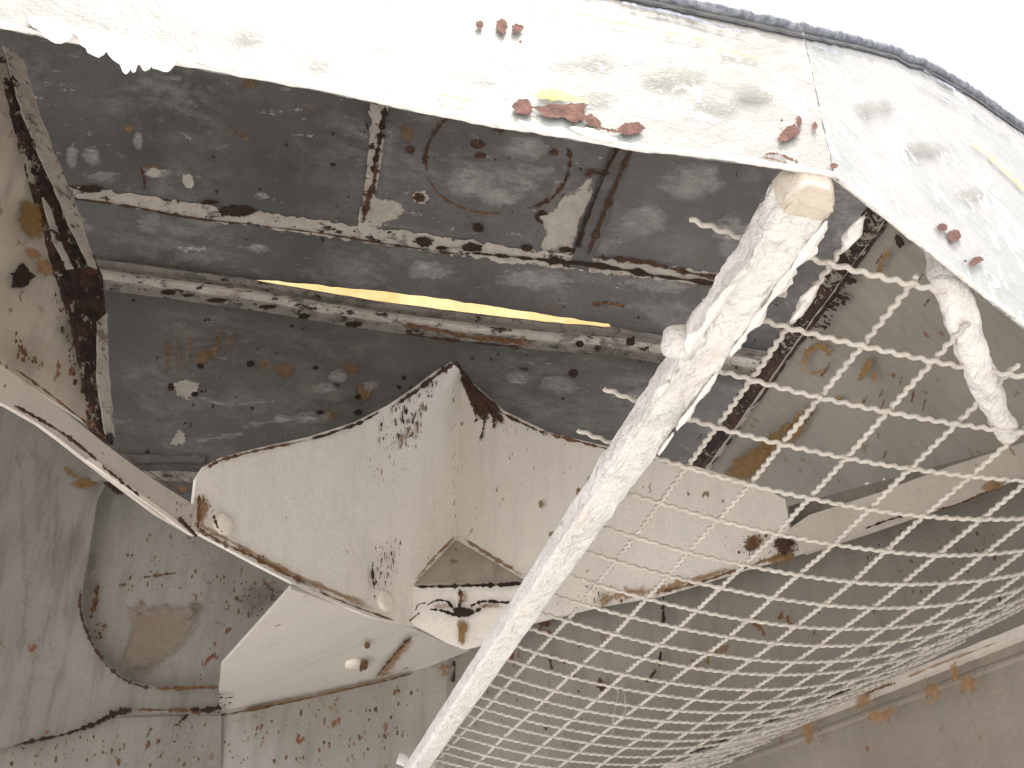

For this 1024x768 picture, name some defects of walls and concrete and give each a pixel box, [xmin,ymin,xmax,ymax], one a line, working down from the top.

corrosion [475,18,524,43]
corrosion [361,106,389,223]
corrosion [404,118,449,170]
peeling [369,198,405,227]
corrosion [74,147,716,286]
peeling [540,178,594,255]
corrosion [11,258,59,289]
corrosion [54,284,87,393]
corrosion [808,274,857,339]
corrosion [208,361,607,485]
corrosion [585,534,799,607]
corrosion [78,585,418,761]